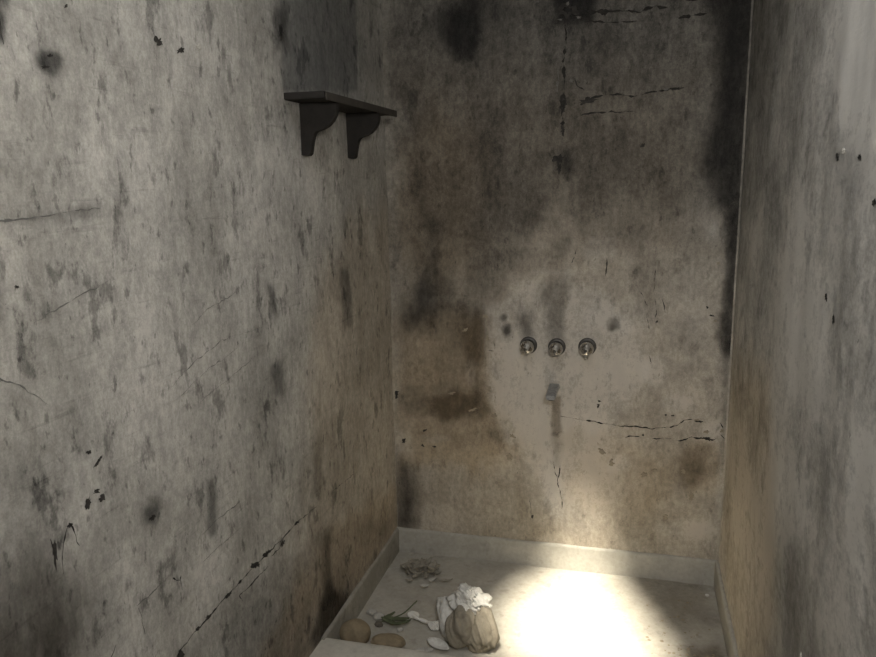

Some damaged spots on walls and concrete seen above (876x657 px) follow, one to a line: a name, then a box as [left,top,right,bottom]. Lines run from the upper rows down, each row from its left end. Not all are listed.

crack [556,0,707,136]
crack [586,414,724,441]
crack [177,512,310,657]